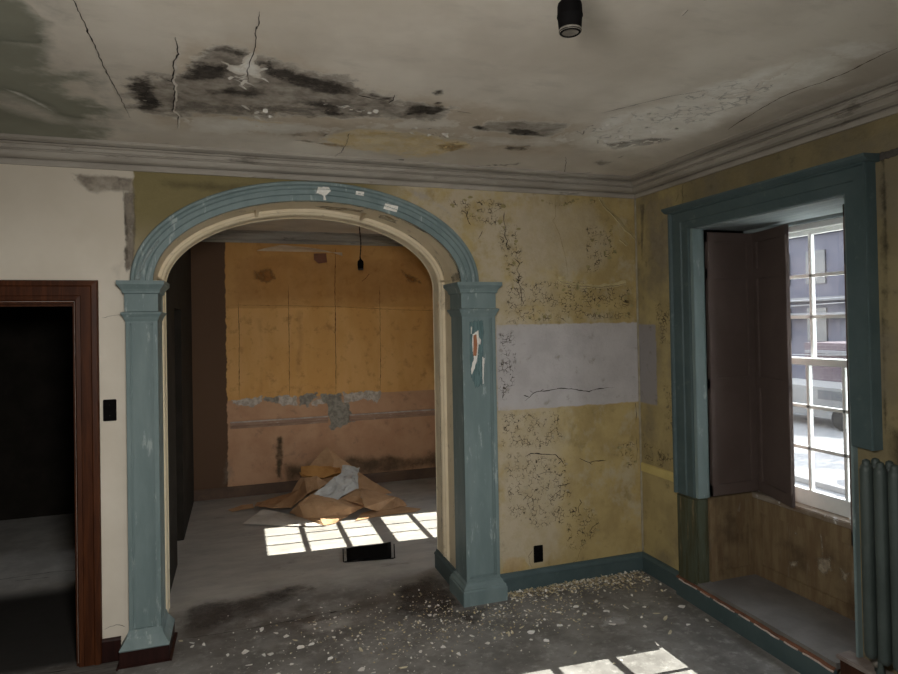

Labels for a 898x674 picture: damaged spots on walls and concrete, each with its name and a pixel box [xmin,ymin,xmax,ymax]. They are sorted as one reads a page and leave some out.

crack [73,0,128,113]
crack [166,38,181,128]
crack [247,11,260,79]
water stain [110,30,898,164]
crack [524,388,604,401]